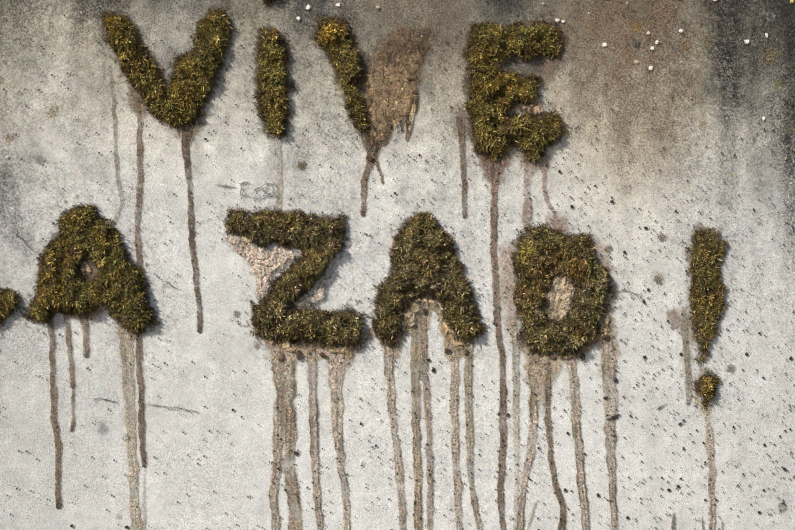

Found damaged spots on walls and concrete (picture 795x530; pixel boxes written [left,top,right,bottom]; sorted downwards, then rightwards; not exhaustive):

water stain [133,98,145,268]
water stain [181,115,203,333]
water stain [48,312,90,509]
water stain [118,327,147,530]
water stain [268,334,369,530]
water stain [384,308,435,530]
water stain [448,334,483,530]
water stain [488,152,566,530]
water stain [565,355,590,530]
water stain [601,315,619,530]
water stain [681,307,692,383]
water stain [701,402,723,530]